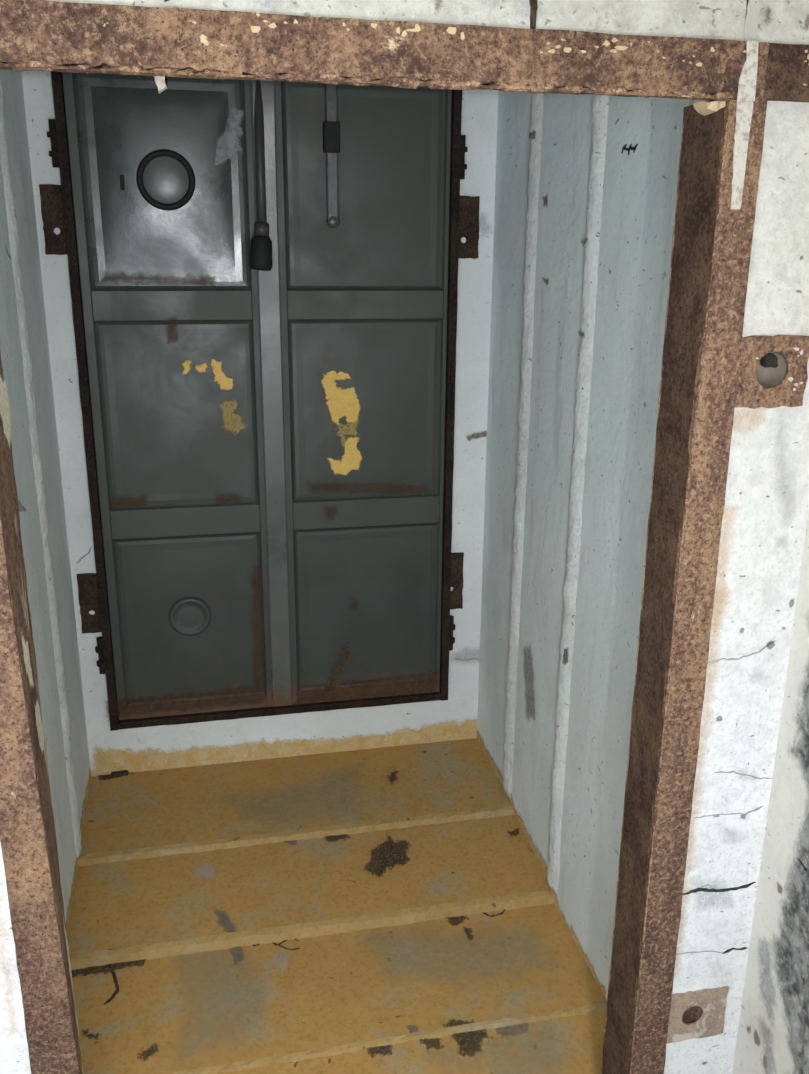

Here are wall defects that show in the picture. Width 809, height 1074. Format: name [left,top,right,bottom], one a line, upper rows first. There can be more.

crack [709,640,776,663]
leakage [792,673,809,791]
crack [683,882,756,895]
leakage [747,813,809,1074]